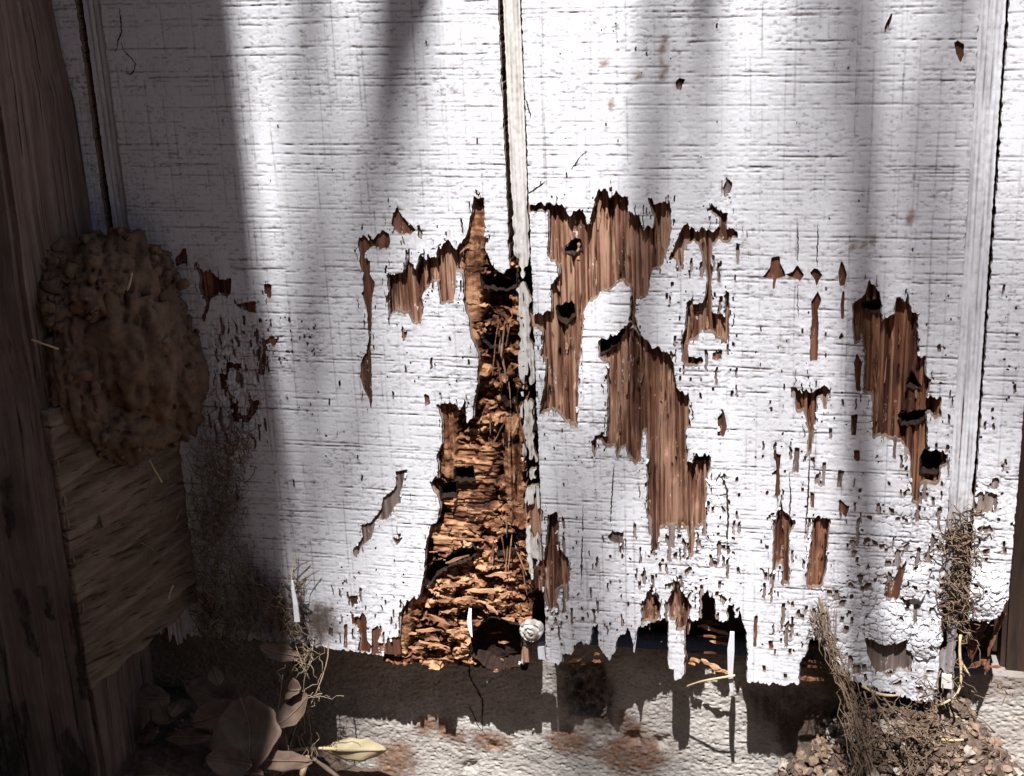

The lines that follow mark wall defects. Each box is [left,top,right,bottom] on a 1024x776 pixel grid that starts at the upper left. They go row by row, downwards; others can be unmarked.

peeling [200,269,272,312]
peeling [220,360,260,424]
peeling [259,336,279,374]
spalling [329,189,737,673]
peeling [763,256,822,361]
peeling [773,385,829,581]
peeling [838,261,940,501]
peeling [753,615,773,648]